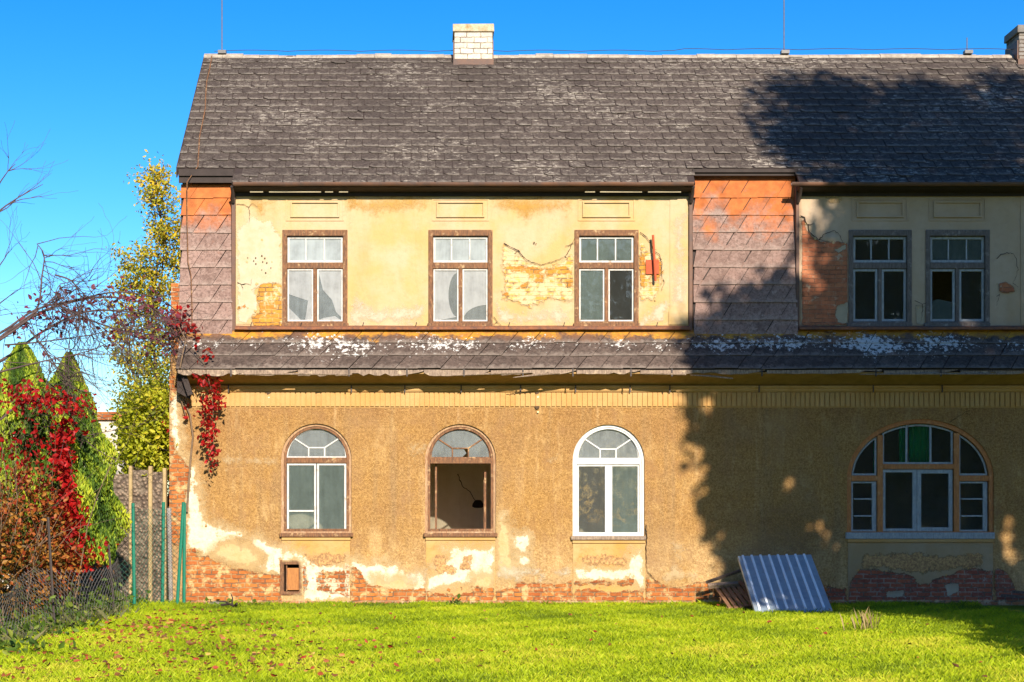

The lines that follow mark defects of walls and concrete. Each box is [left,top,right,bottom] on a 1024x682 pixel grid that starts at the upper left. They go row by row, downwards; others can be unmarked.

peeling [236,216,282,326]
flaking render [501,242,574,308]
flaking render [639,243,665,301]
flaking render [801,220,848,326]
flaking render [169,374,746,602]
flaking render [823,567,1024,600]